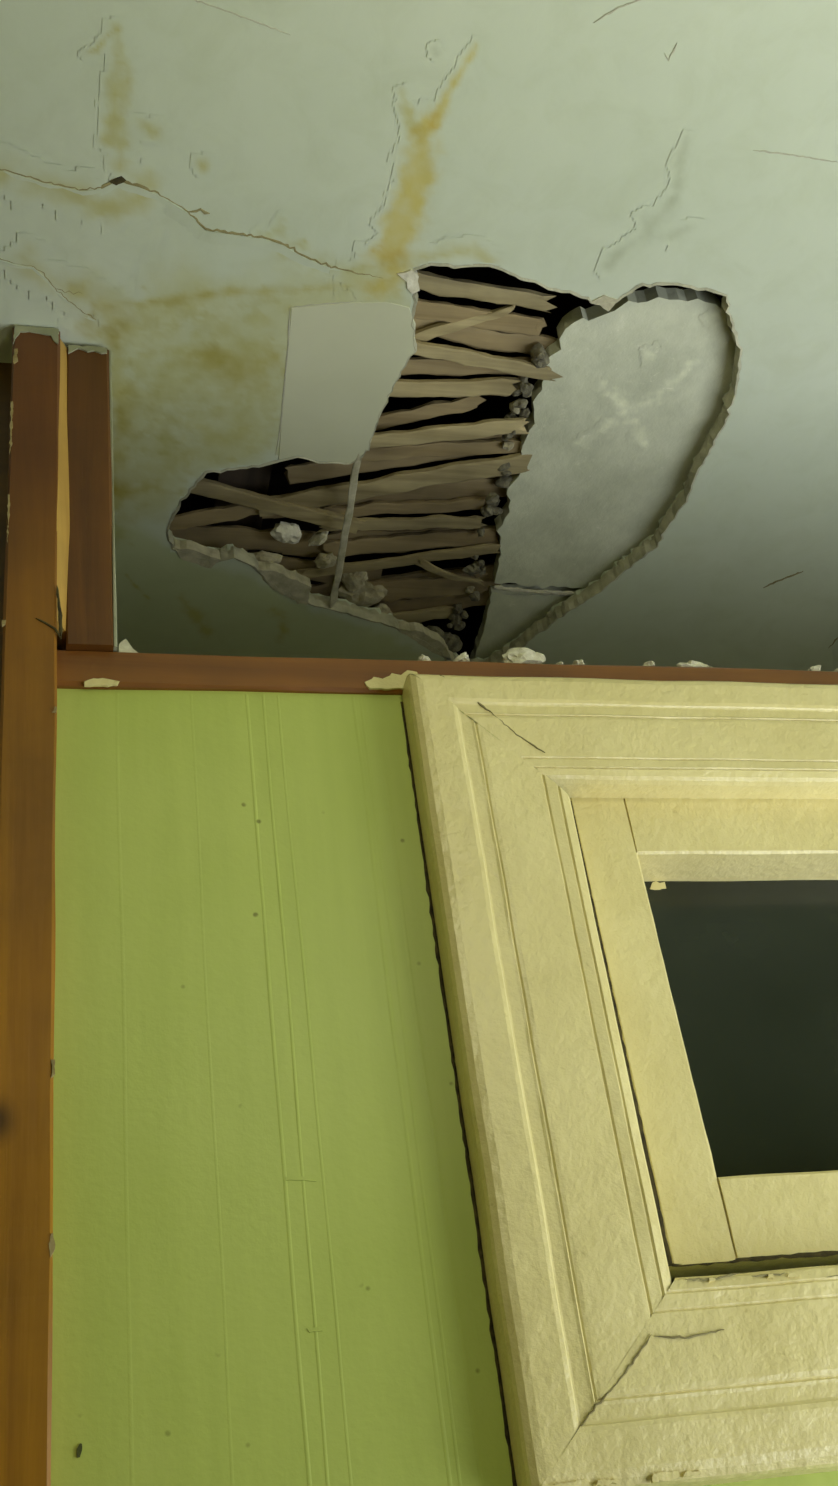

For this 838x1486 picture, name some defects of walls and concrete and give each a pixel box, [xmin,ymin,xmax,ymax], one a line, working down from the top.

water stain [0,16,362,529]
crack [0,169,381,453]
flaking render [114,263,743,690]